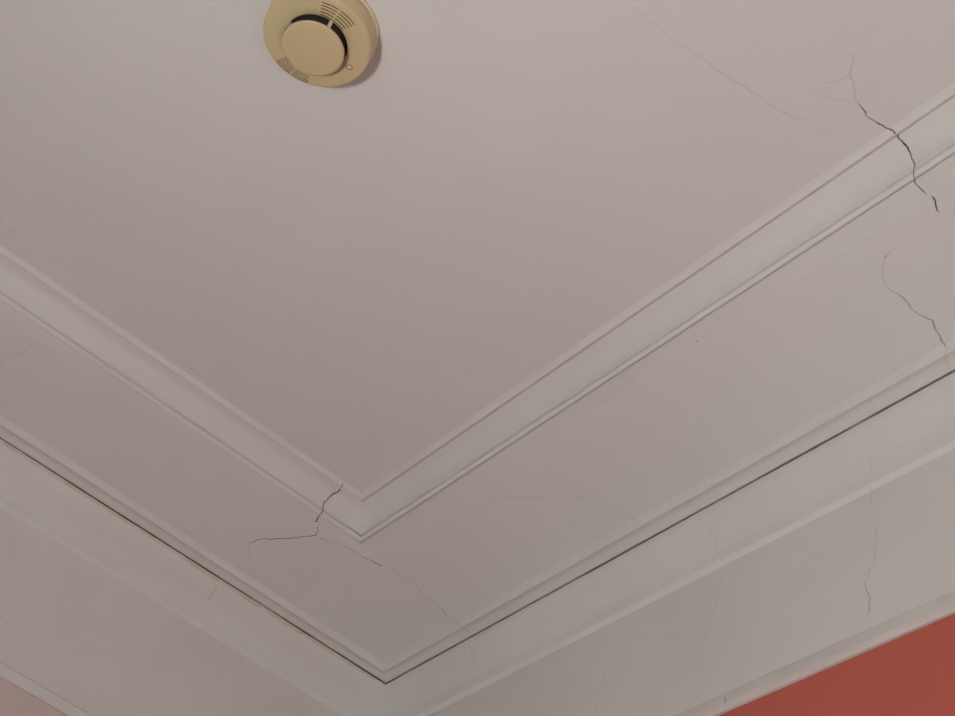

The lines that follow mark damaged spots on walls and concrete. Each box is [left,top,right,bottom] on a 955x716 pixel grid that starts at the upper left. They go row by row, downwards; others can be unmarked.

crack [858,103,940,213]
crack [0,370,955,685]